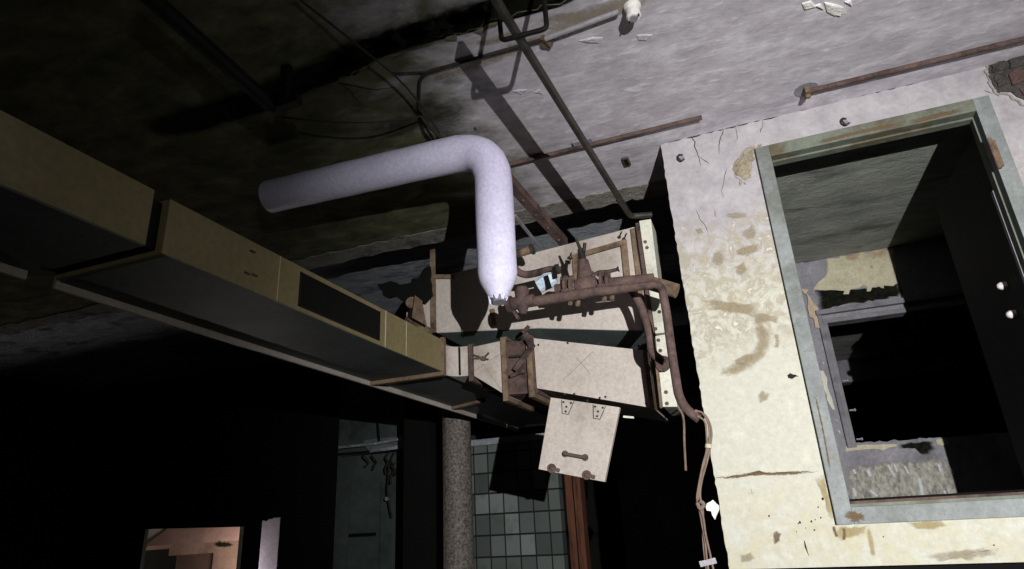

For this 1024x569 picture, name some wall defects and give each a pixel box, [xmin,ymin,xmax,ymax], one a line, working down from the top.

spalling [984,55,1024,106]
crack [663,116,777,232]
spalling [732,144,762,186]
peeling [801,248,901,329]
water stain [711,301,778,373]